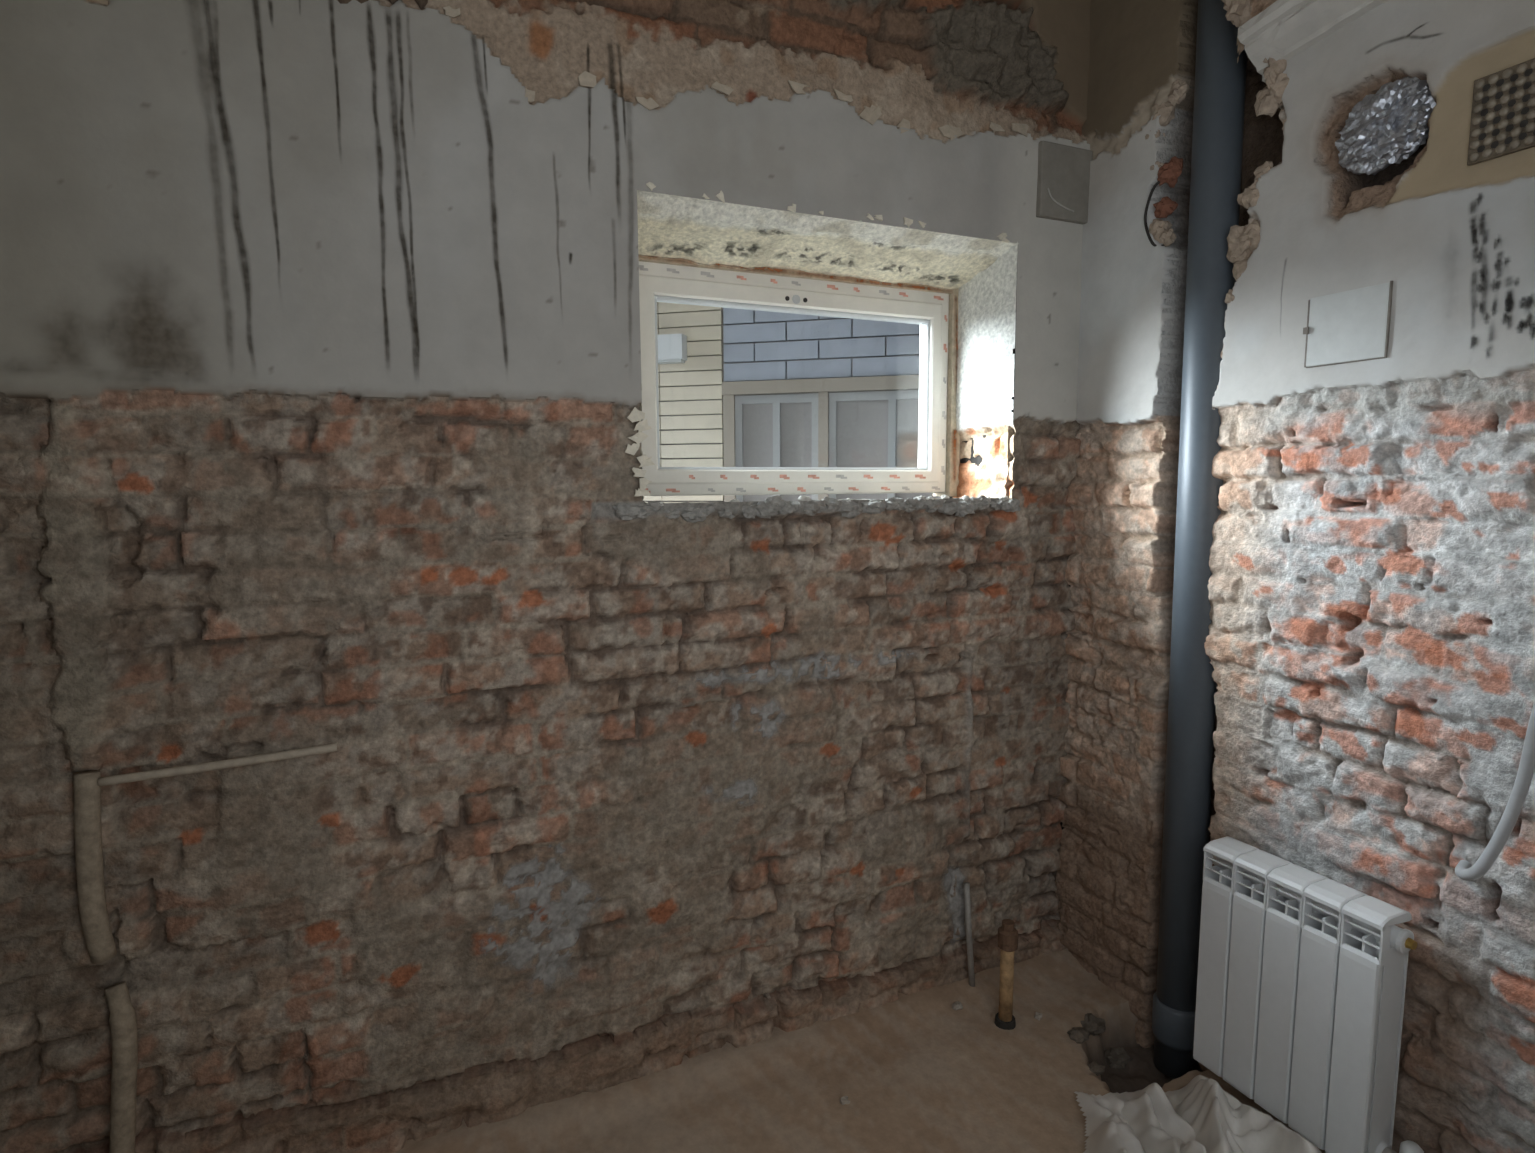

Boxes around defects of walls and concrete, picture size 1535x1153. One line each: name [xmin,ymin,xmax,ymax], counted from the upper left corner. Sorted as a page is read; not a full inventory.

damp [254,0,272,92]
damp [368,10,408,227]
damp [610,58,625,186]
flaking render [338,0,1091,144]
flaking render [1254,58,1290,132]
flaking render [1313,25,1535,221]
damp [400,228,419,356]
damp [492,203,504,320]
flaking render [1225,161,1282,304]
damp [1471,194,1535,356]
spalling [612,407,1021,523]
spalling [1081,1001,1203,1094]